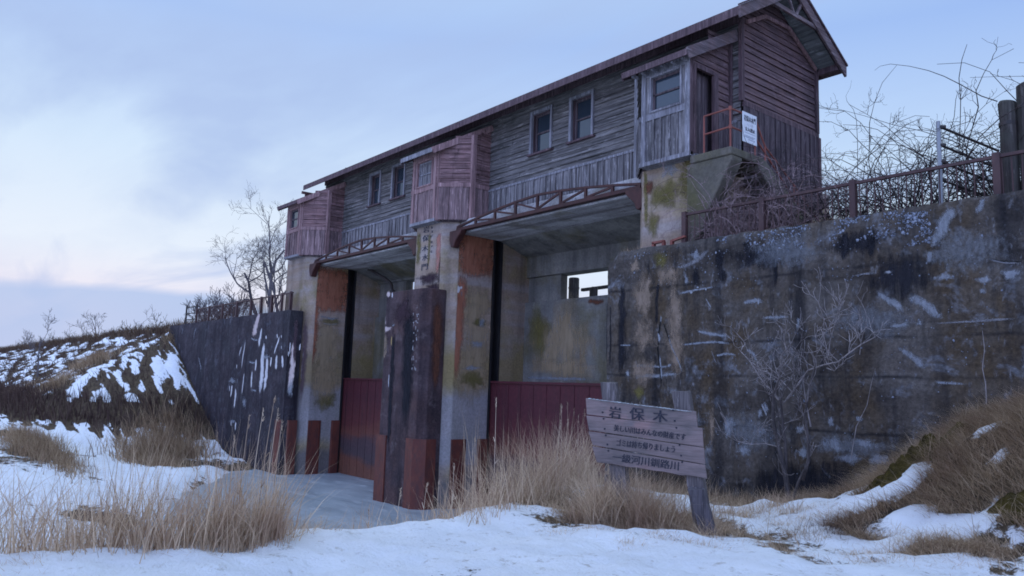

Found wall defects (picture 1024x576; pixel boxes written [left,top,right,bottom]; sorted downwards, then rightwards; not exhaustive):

leakage [644,160,690,234]
corrosion [312,267,348,396]
corrosion [454,235,494,392]
leakage [679,240,789,307]
leakage [831,210,1005,324]